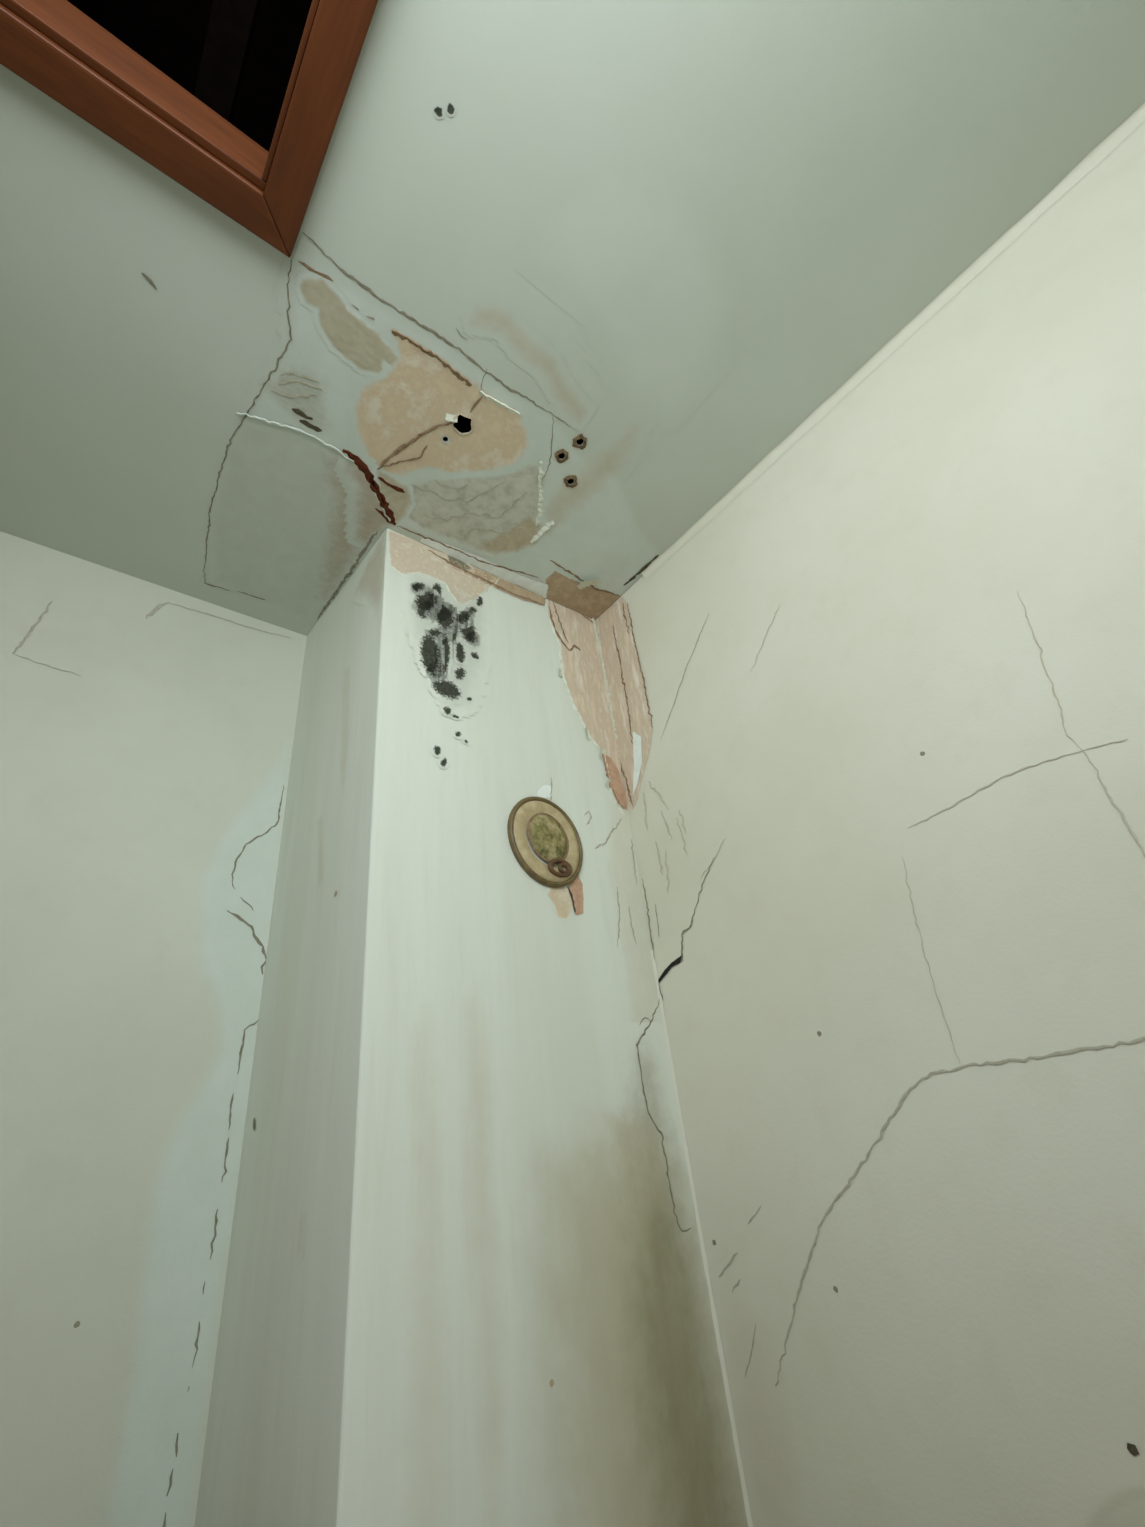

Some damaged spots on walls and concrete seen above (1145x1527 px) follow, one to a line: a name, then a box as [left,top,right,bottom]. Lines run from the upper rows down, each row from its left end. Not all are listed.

crack [146,232,659,638]
leakage [351,530,494,769]
peeling [294,261,653,814]
rust [550,431,591,491]
crack [751,604,780,669]
crack [188,1019,259,1390]
crack [227,785,284,974]
peeling [545,875,583,921]
leakage [389,791,821,1527]
crack [584,781,724,1232]
crack [775,593,1145,1386]
crack [163,1433,179,1527]